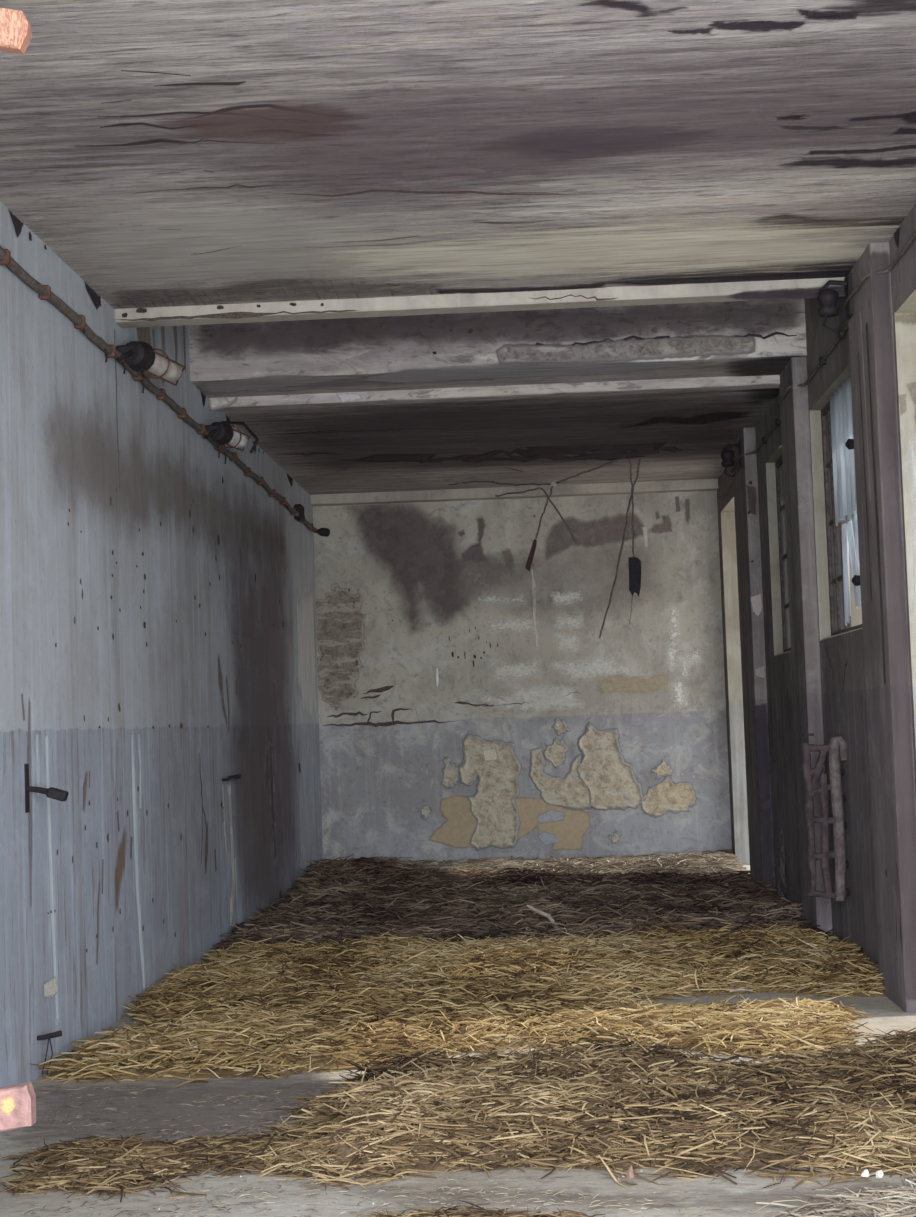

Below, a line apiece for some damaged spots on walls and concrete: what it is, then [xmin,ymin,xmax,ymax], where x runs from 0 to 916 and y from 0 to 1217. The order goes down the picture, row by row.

water stain [582,0,686,17]
water stain [669,0,916,34]
water stain [546,497,690,557]
water stain [359,505,522,626]
crack [322,686,530,727]
flaking render [418,717,697,851]
corrosion [97,812,132,964]